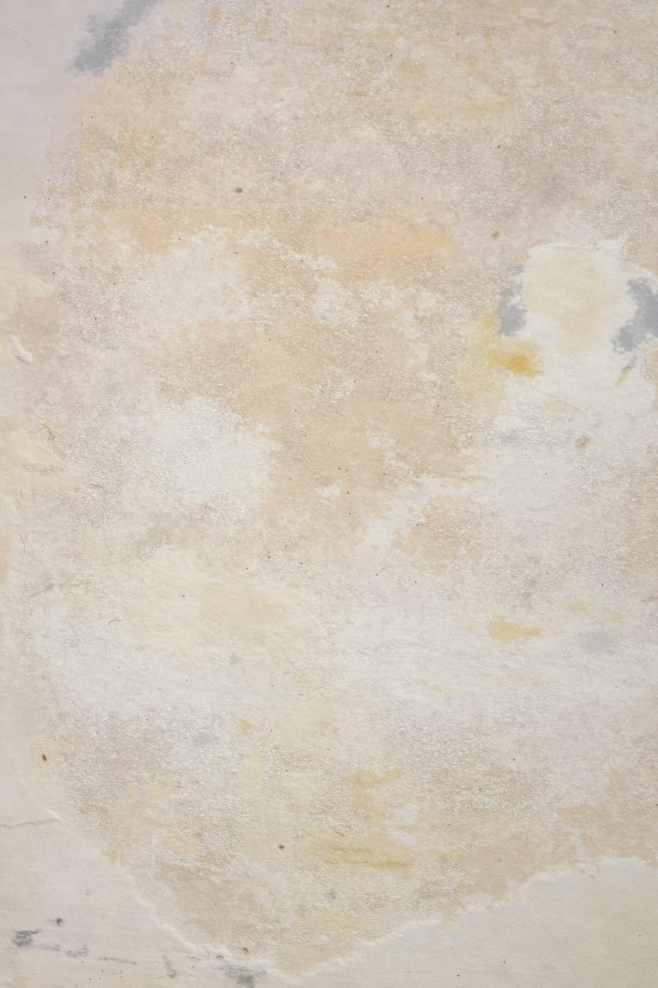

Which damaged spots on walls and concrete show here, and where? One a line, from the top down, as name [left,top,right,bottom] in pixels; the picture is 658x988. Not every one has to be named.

damp [42,0,182,101]
damp [12,233,70,285]
peeling [3,286,72,366]
damp [444,256,588,453]
damp [607,274,658,388]
peeling [391,500,488,579]
damp [192,578,294,671]
damp [445,610,549,701]
damp [560,598,628,662]
damp [24,743,62,781]
flaking render [0,768,658,988]
damp [227,766,488,988]